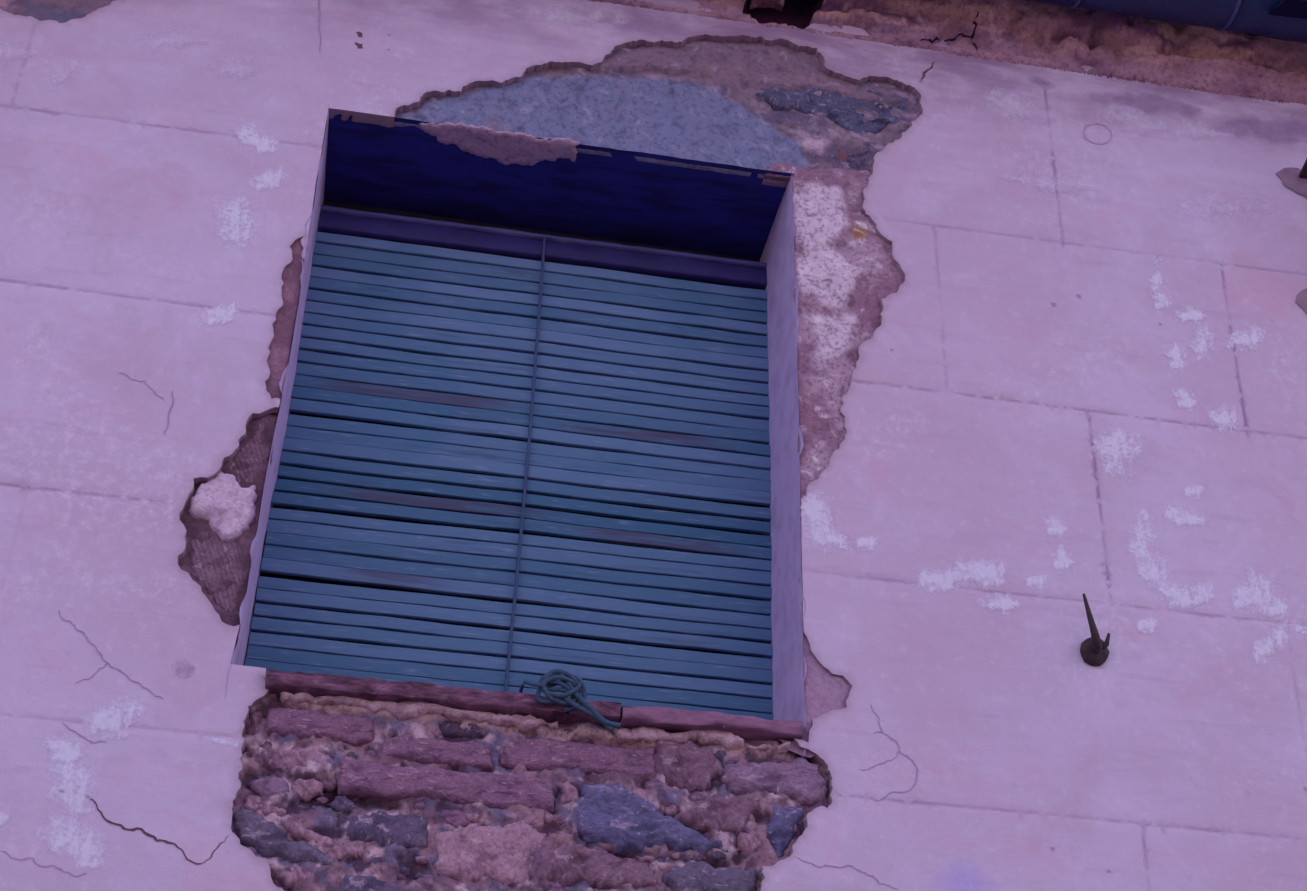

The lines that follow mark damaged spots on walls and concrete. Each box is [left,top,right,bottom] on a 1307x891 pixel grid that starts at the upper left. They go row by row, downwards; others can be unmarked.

spalling [0,0,116,23]
spalling [749,0,785,12]
peeling [237,128,277,152]
peeling [218,169,281,246]
spalling [382,39,920,550]
spalling [178,234,309,645]
crack [59,610,162,698]
spalling [214,635,851,891]
crack [860,705,919,801]
crack [59,789,227,865]